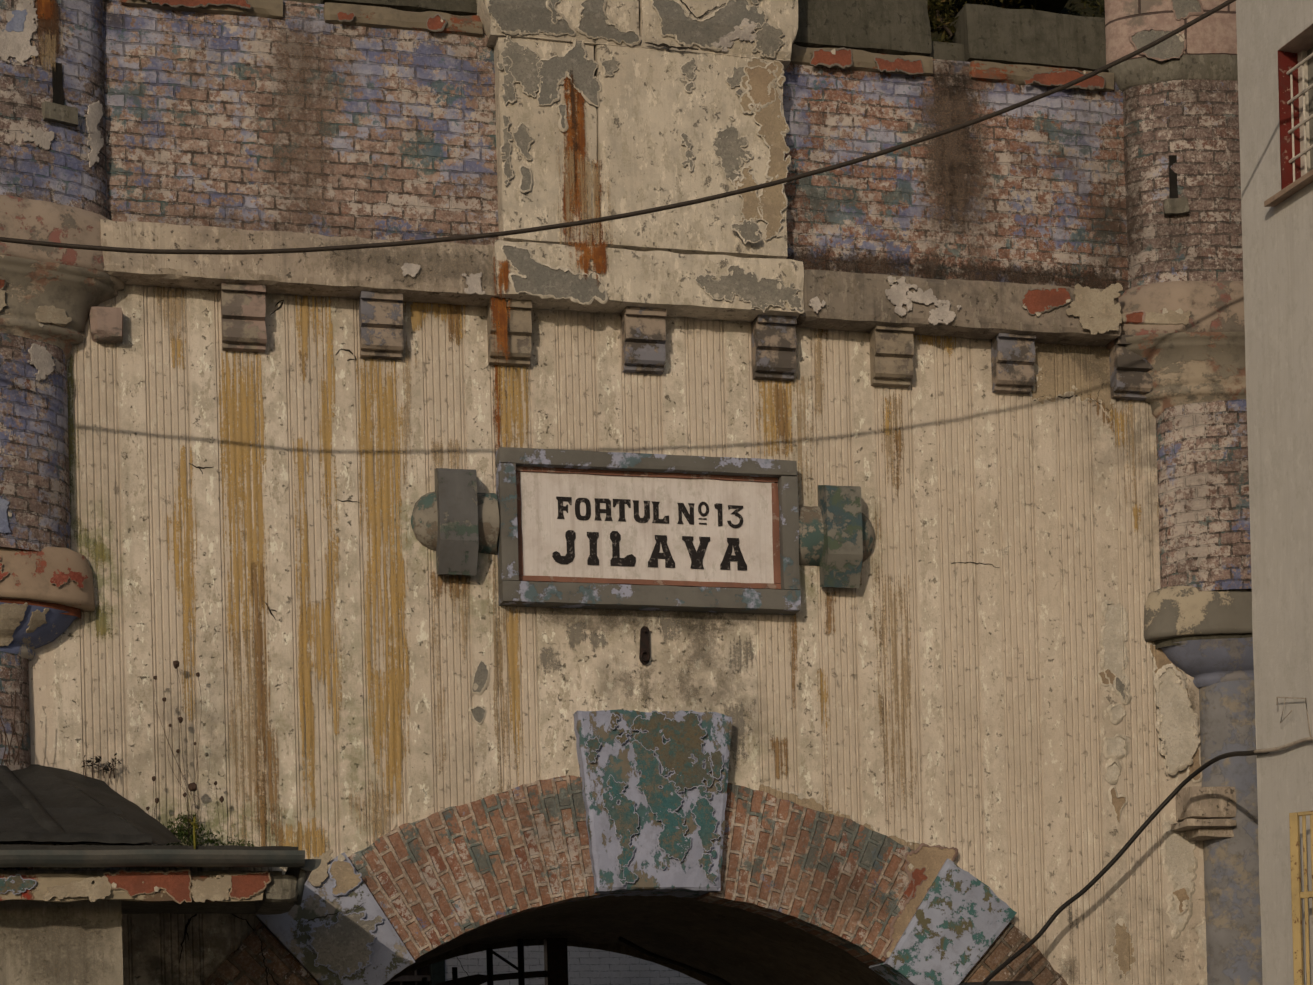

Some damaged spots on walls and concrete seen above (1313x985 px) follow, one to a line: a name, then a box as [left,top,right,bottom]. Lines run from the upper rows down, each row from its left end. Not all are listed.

corrosion [33,0,62,70]
spalling [487,0,641,193]
corrosion [558,72,611,284]
flaking render [651,0,791,244]
damp [923,68,981,245]
spalling [501,243,608,305]
peeling [695,264,804,313]
peeling [0,602,49,647]
peeling [0,869,271,904]
spalling [308,849,362,896]
peeling [585,710,724,885]
flaking render [1160,821,1207,985]